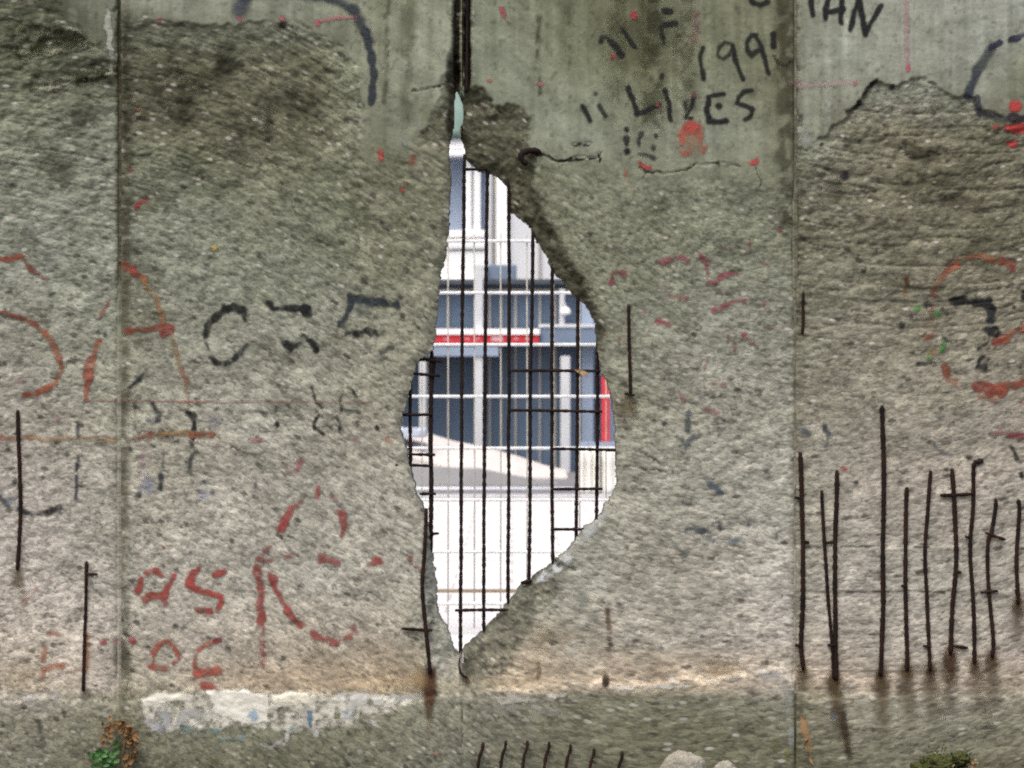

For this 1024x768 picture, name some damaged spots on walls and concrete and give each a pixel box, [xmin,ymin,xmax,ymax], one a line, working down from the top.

spalling [804,82,1022,179]
crack [536,143,601,163]
spalling [395,0,616,685]
corrosion [1014,602,1022,626]
corrosion [423,669,436,715]
corrosion [901,668,912,699]
corrosion [926,651,955,693]
corrosion [972,656,997,681]